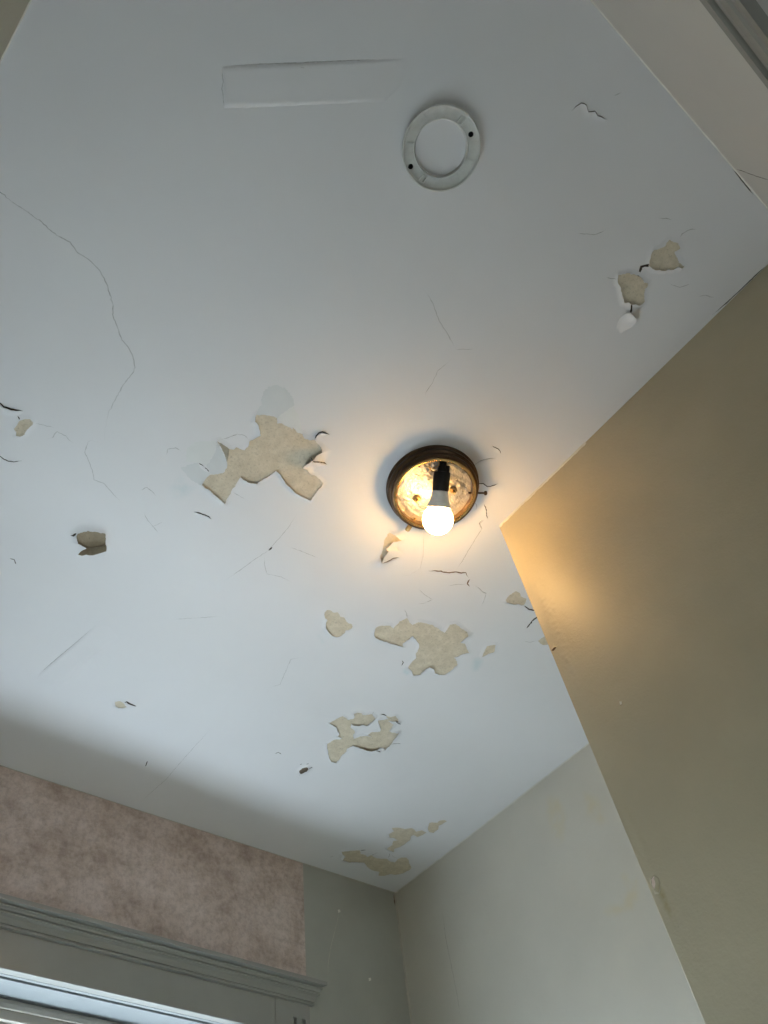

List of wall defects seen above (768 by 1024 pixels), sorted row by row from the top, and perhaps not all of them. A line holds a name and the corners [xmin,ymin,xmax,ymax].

crack [572,103,607,122]
peeling [612,235,688,334]
crack [0,403,23,417]
peeling [181,385,333,507]
flaking render [65,520,117,559]
peeling [365,529,407,575]
peeling [320,607,356,639]
crack [428,570,486,606]
peeling [502,588,535,613]
peeling [370,615,499,678]
peeling [323,710,403,764]
peeling [338,818,449,877]